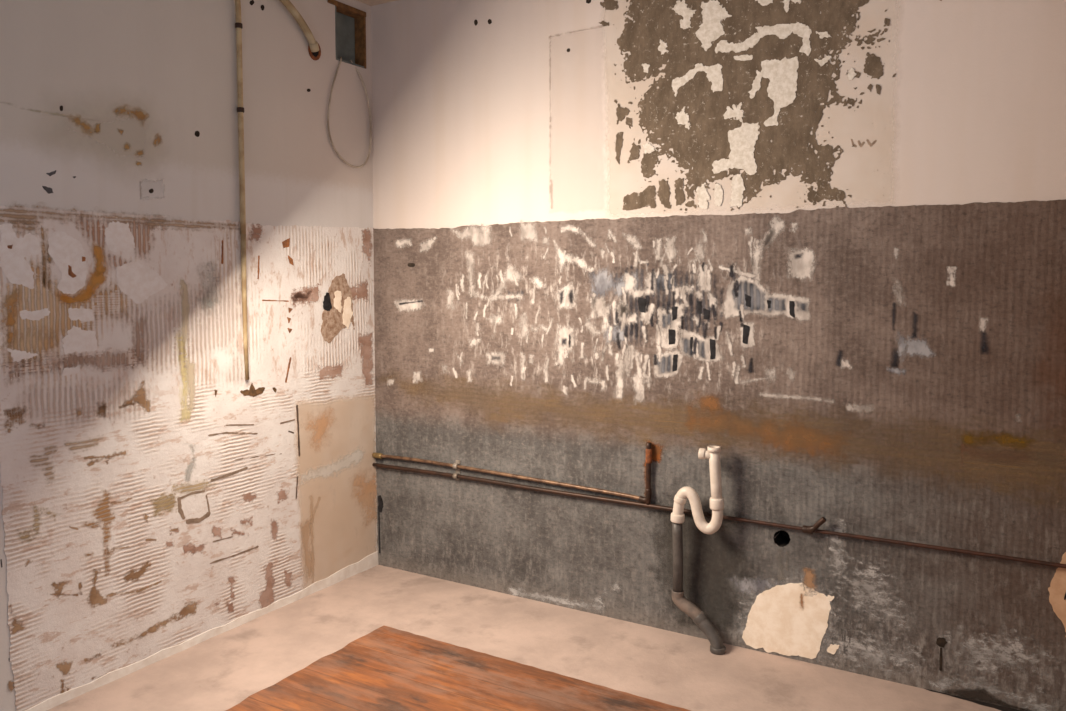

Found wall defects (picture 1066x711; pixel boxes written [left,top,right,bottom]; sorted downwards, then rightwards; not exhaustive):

flaking render [442,0,896,403]
peeling [0,224,87,294]
peeling [104,221,168,304]
peeling [62,307,98,354]
spalling [321,273,355,343]
spalling [240,357,291,397]
spalling [84,451,126,467]
corrosion [644,441,663,496]
spalling [177,490,211,524]
spalling [1048,552,1066,637]
spalling [116,602,197,647]
spalling [56,654,100,693]